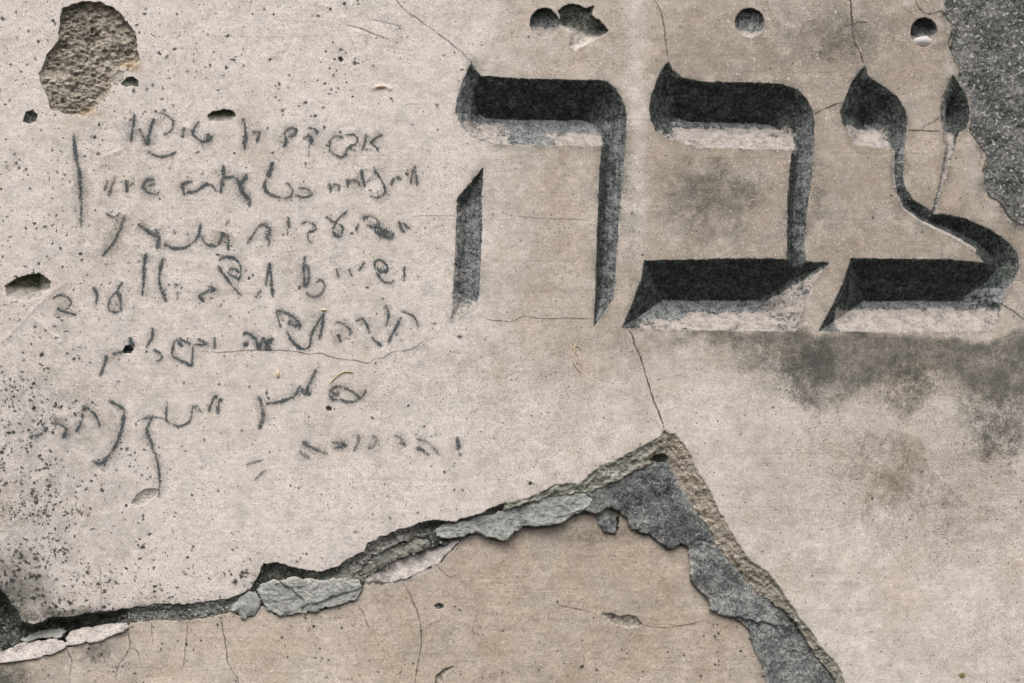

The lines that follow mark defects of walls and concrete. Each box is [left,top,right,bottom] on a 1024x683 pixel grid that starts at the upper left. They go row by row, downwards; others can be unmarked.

spalling [39,1,140,117]
water stain [83,7,233,157]
water stain [298,41,374,148]
spalling [558,4,609,51]
spalling [943,0,1024,224]
water stain [0,192,89,321]
water stain [712,329,1024,407]
peeling [131,488,159,506]
crack [0,328,845,683]
spalling [601,613,643,628]
peeling [435,666,454,683]